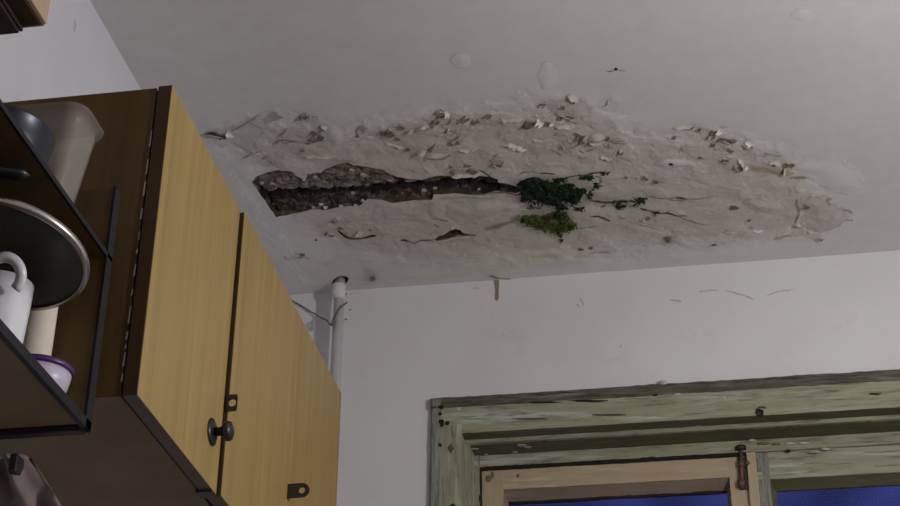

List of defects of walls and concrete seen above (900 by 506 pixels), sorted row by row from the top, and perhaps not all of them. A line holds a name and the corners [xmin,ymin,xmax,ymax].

spalling [200,92,627,241]
leakage [263,111,807,258]
peeling [672,124,795,176]
corrosion [489,276,510,301]